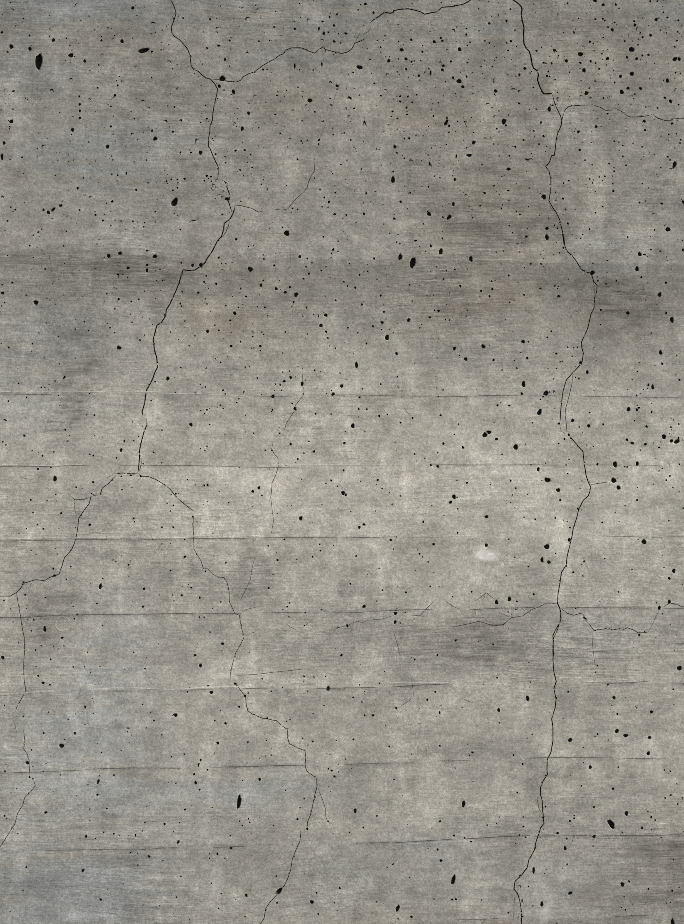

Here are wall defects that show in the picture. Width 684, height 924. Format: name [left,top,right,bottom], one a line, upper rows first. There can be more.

crack [0,0,471,924]
crack [338,0,684,924]